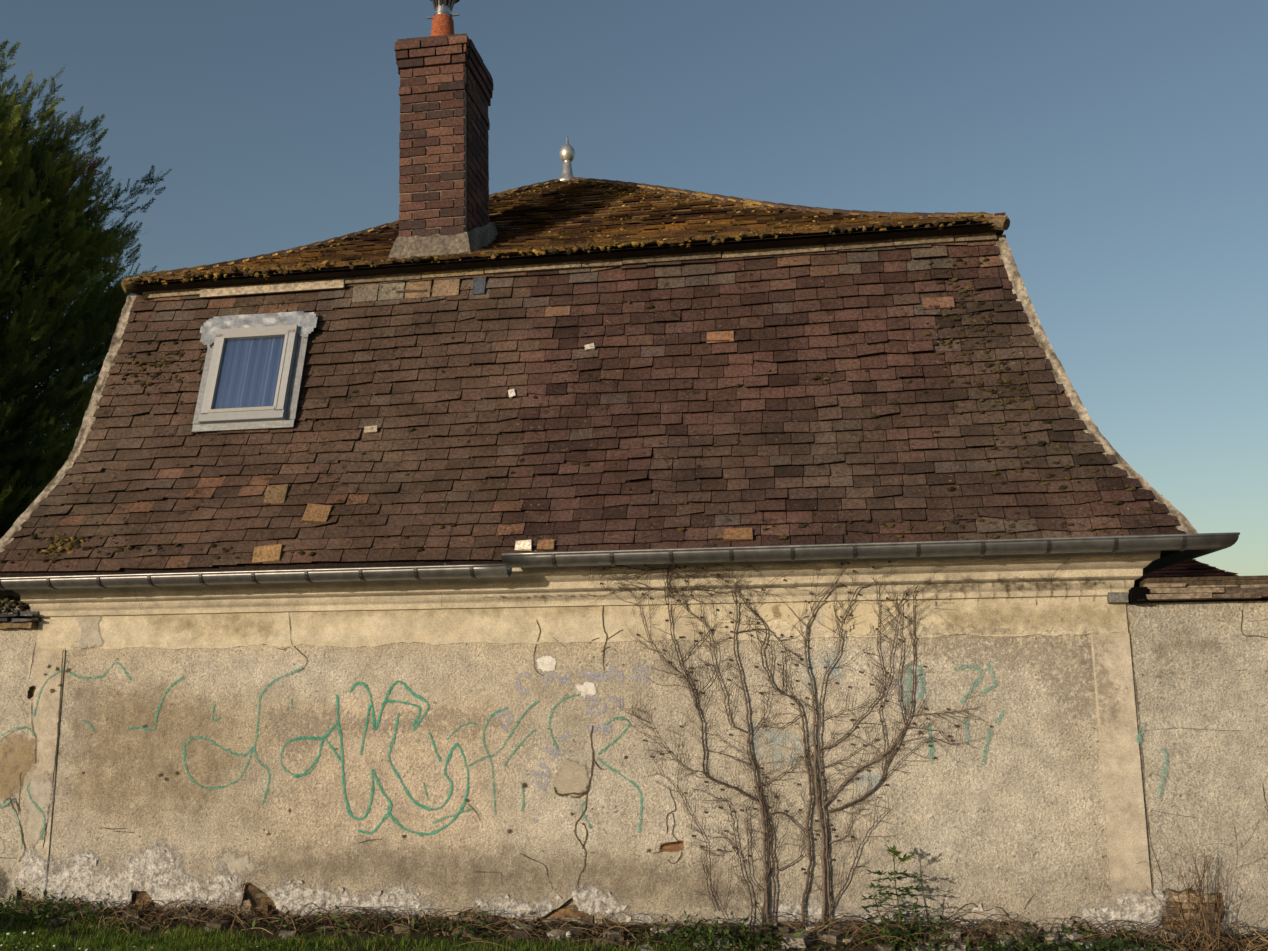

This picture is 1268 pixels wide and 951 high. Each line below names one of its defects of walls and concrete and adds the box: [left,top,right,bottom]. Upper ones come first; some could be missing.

water stain [12,842,439,918]
crack [520,725,604,892]
water stain [475,884,676,924]
flaking render [647,840,684,852]